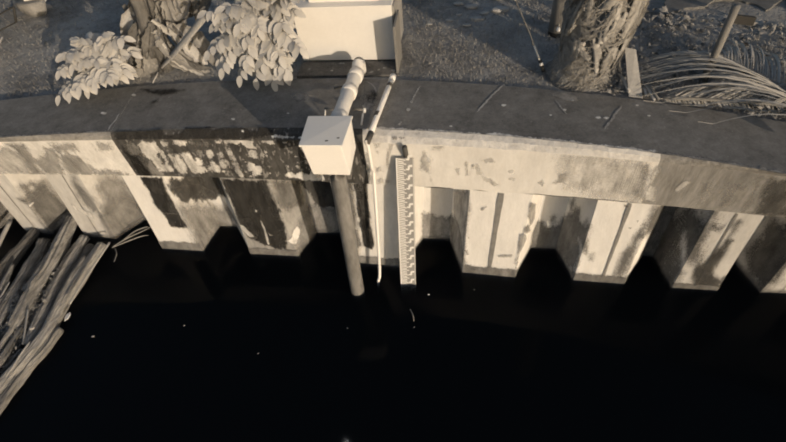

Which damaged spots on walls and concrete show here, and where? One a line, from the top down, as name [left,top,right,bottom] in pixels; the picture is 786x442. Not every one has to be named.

water stain [0,143,144,236]
peeling [125,130,325,181]
water stain [531,155,744,298]
water stain [743,176,786,290]